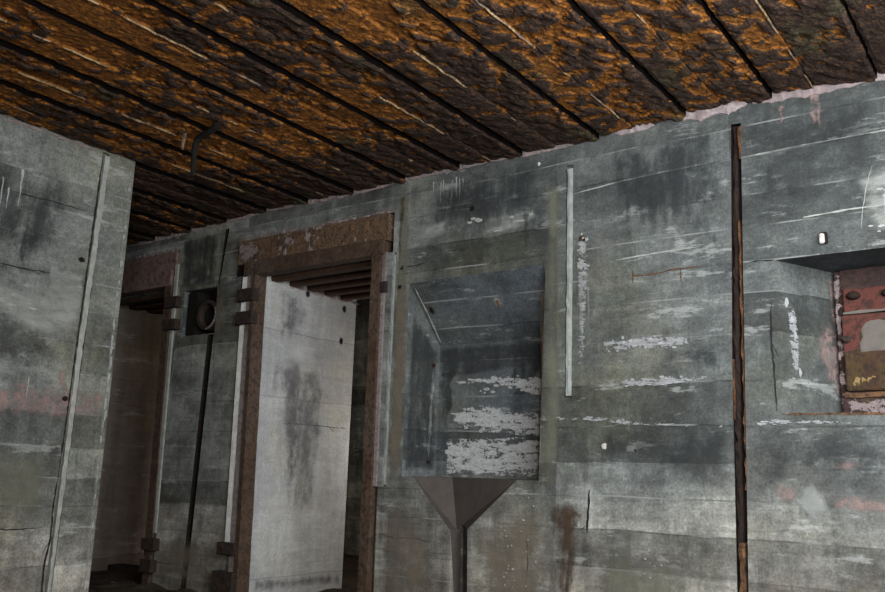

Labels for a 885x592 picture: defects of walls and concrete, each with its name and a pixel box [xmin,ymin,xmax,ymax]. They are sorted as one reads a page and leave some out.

peeling [457,375,542,395]
corrosion [732,220,747,490]
water stain [288,390,317,476]
peeling [445,405,541,477]
corrosion [552,506,579,592]
corrosion [738,543,749,592]